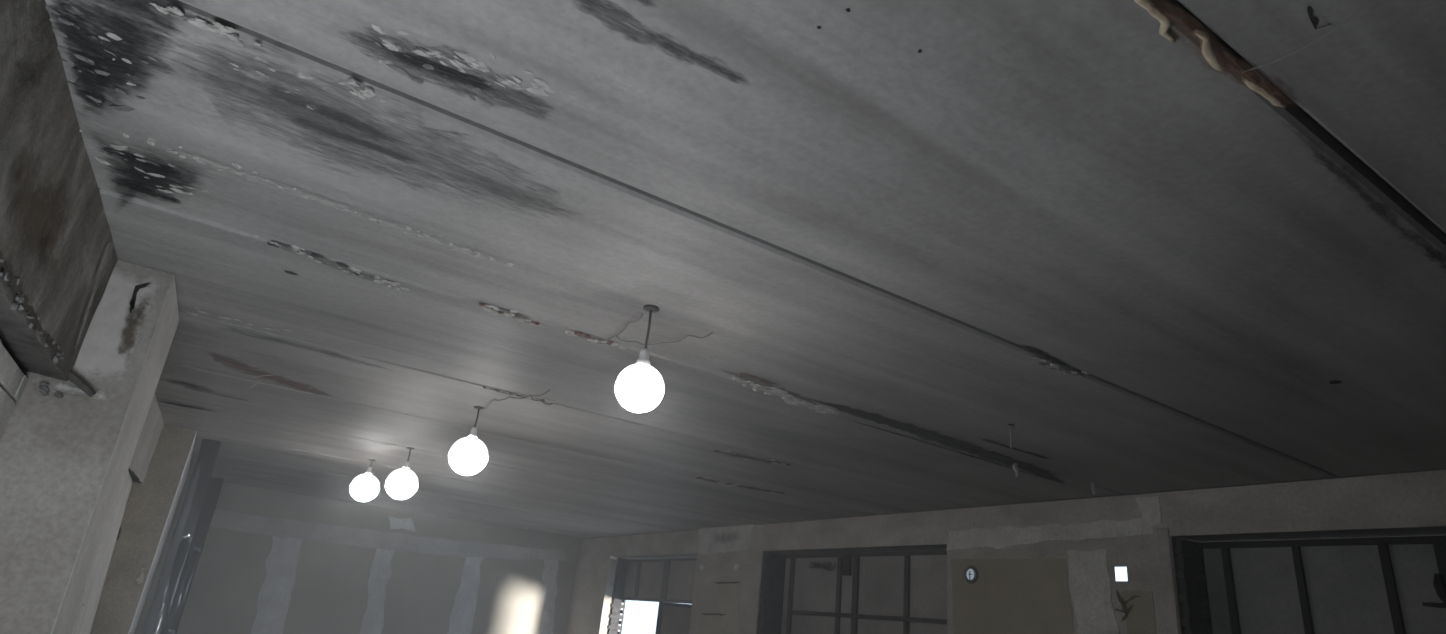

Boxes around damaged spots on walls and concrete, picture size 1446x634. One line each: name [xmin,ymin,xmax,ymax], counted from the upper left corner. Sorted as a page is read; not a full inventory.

damp [46,0,176,112]
damp [352,24,554,117]
damp [578,0,743,82]
damp [79,130,210,204]
damp [190,53,563,213]
spalling [0,252,96,397]